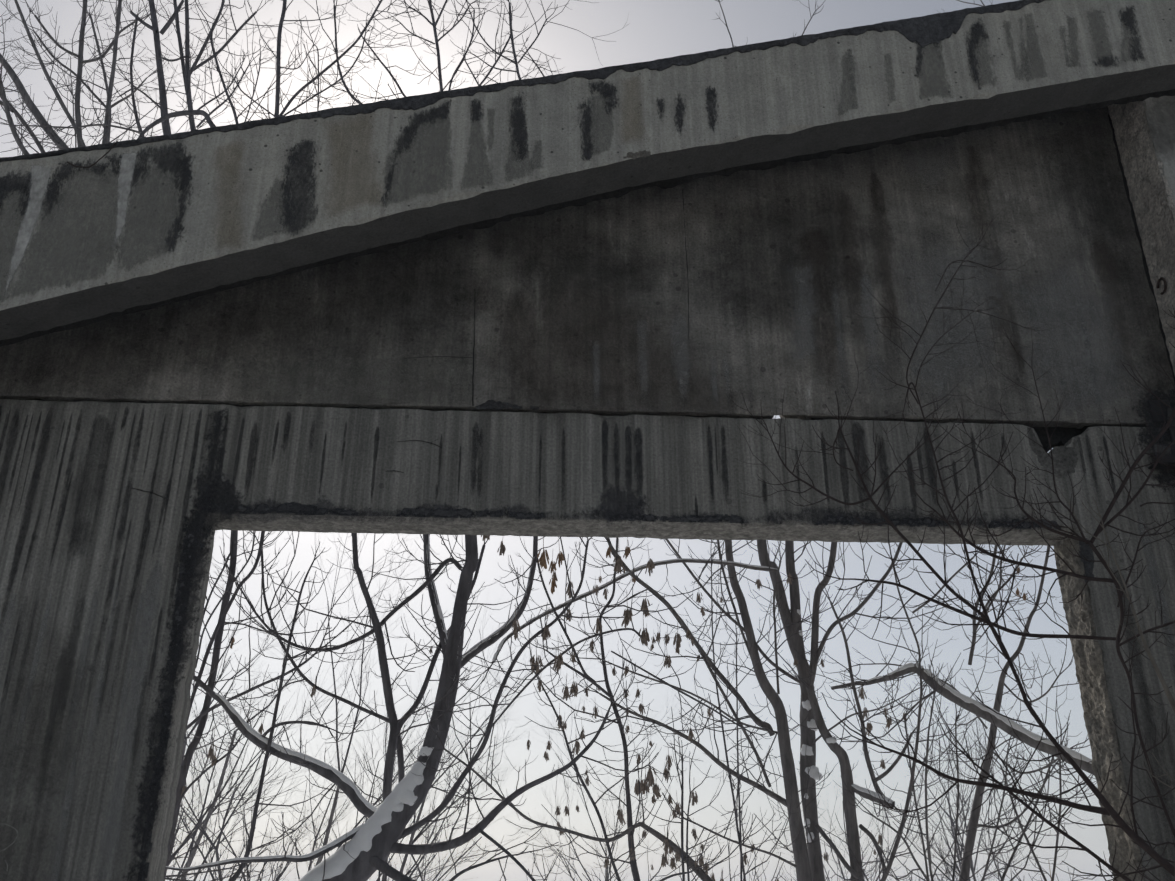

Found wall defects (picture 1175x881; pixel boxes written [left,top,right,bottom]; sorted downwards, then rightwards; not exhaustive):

water stain [967,22,996,87]
water stain [1060,6,1144,66]
water stain [577,80,619,161]
water stain [656,95,685,133]
water stain [705,86,719,131]
water stain [0,142,192,301]
water stain [253,140,318,240]
water stain [0,407,97,593]
water stain [214,414,258,488]
water stain [601,420,647,524]
water stain [821,423,890,507]
water stain [89,408,202,685]